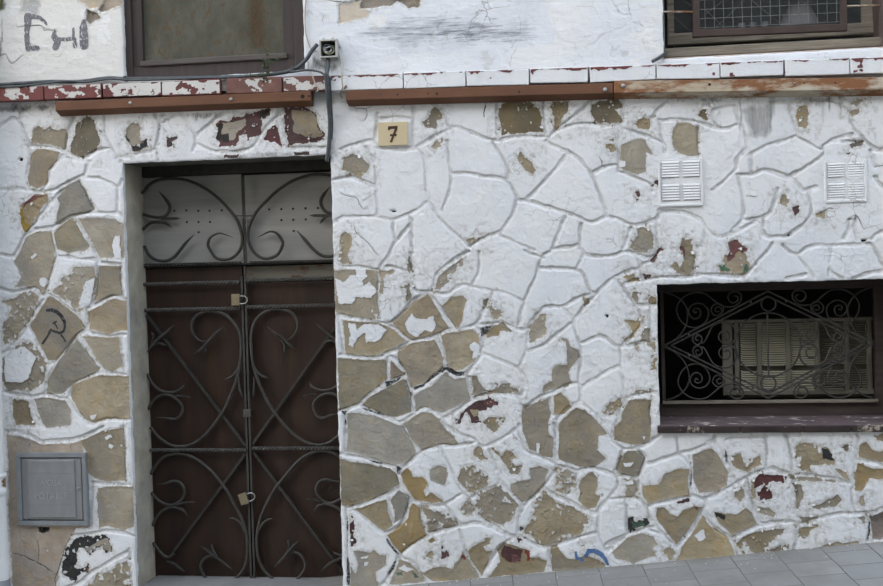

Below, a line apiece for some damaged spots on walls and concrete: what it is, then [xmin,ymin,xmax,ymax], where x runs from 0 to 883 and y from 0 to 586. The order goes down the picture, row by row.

spalling [80,0,122,24]
peeling [339,0,420,24]
peeling [4,80,220,100]
peeling [239,78,271,92]
peeling [216,107,325,158]
peeling [2,115,134,586]
peeling [334,223,883,586]